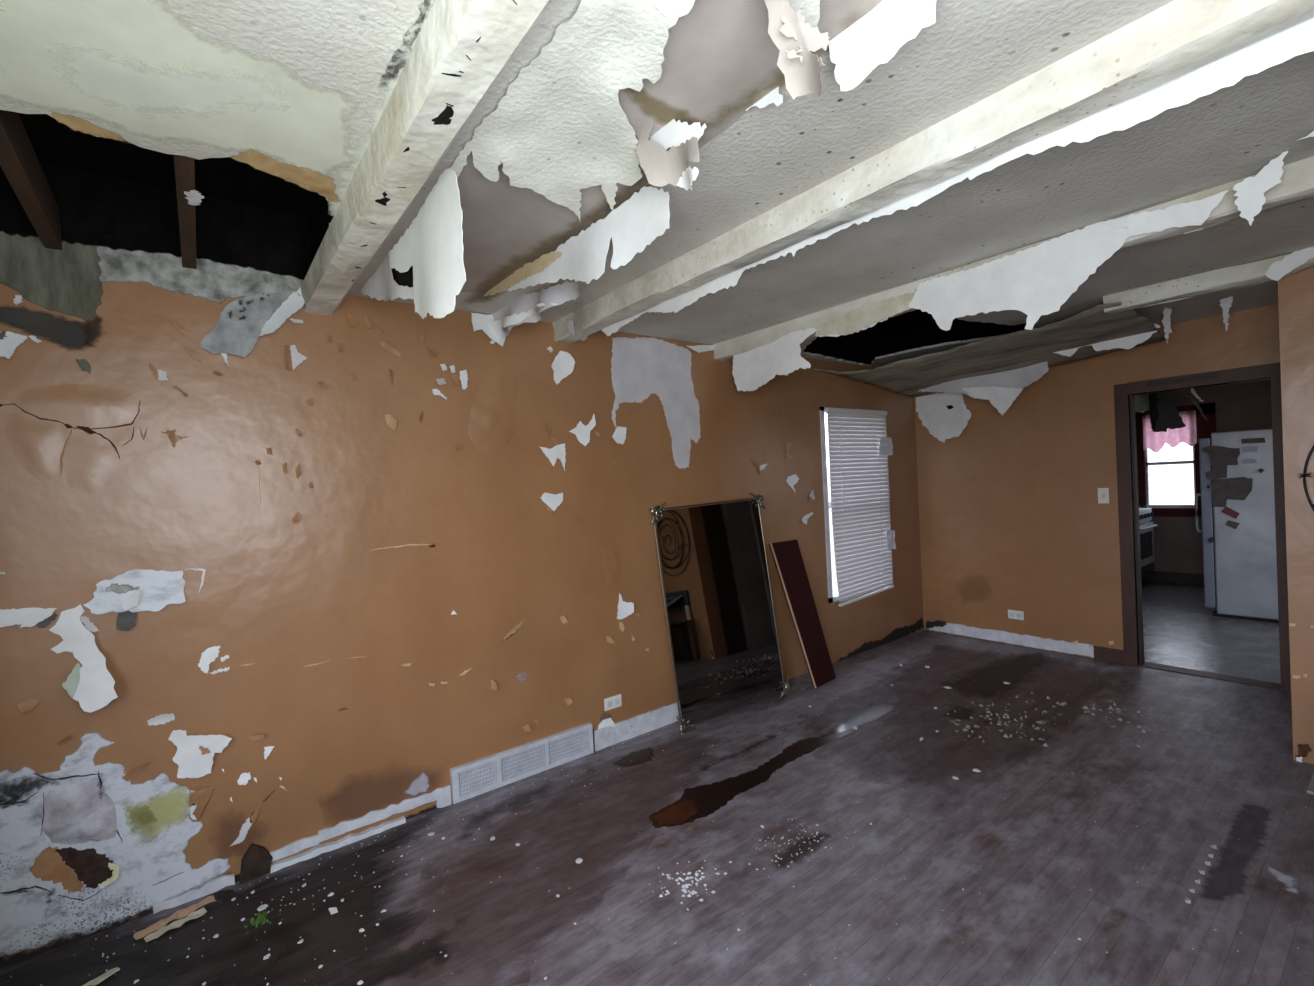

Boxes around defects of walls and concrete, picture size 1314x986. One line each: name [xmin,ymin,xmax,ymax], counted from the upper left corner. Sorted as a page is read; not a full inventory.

peeling [0,0,356,175]
flaking render [0,231,307,376]
peeling [184,190,204,206]
peeling [360,0,937,384]
peeling [540,17,1314,470]
crack [0,402,147,474]
peeling [432,364,468,400]
peeling [0,568,206,713]
damp [0,733,452,986]